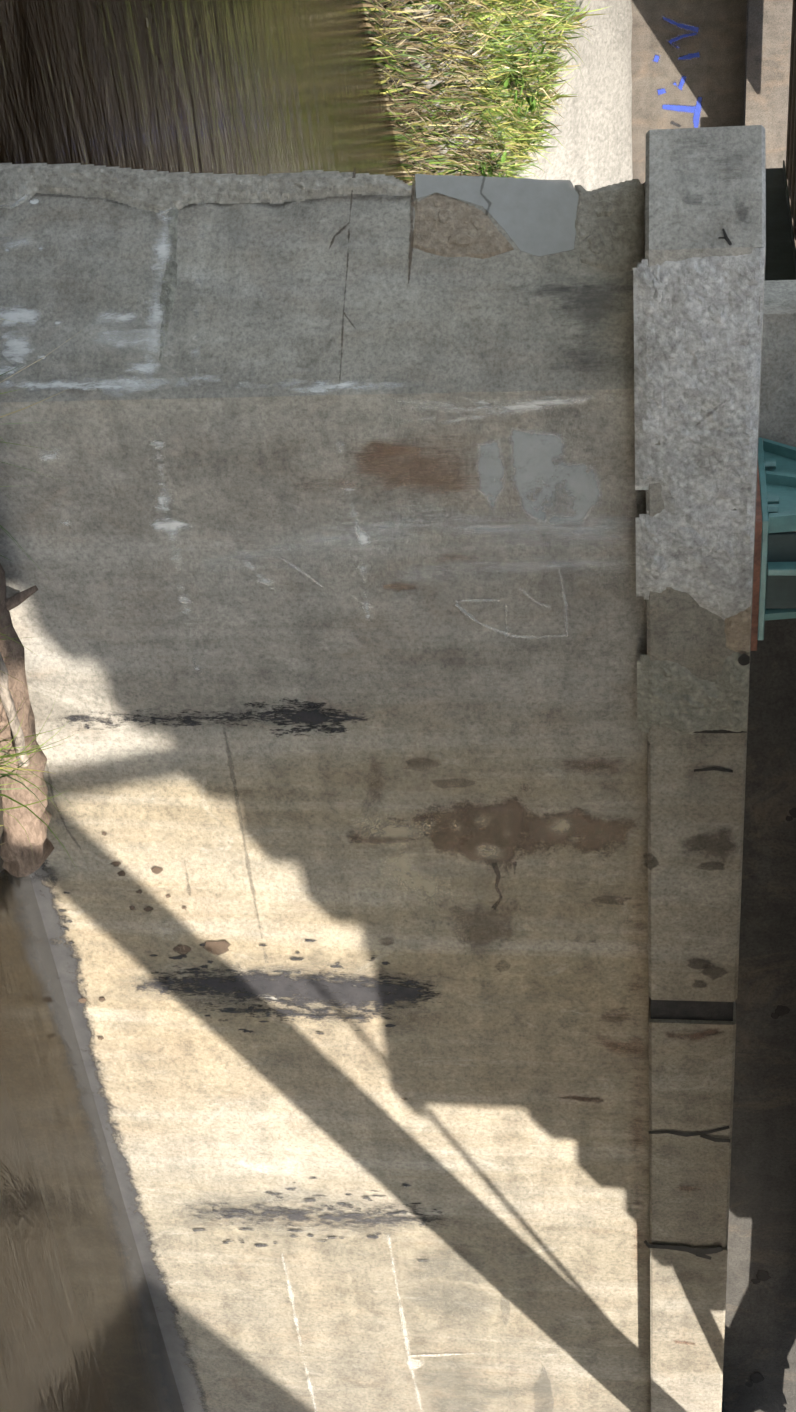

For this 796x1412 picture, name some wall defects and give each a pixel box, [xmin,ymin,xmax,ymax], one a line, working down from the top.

damp [153,210,169,269]
spalling [0,163,514,361]
damp [0,296,165,390]
damp [299,382,363,392]
spalling [574,179,765,735]
damp [59,699,374,736]
damp [133,938,441,1035]
crack [649,1126,730,1143]
damp [186,1177,448,1247]
crack [644,1240,723,1260]